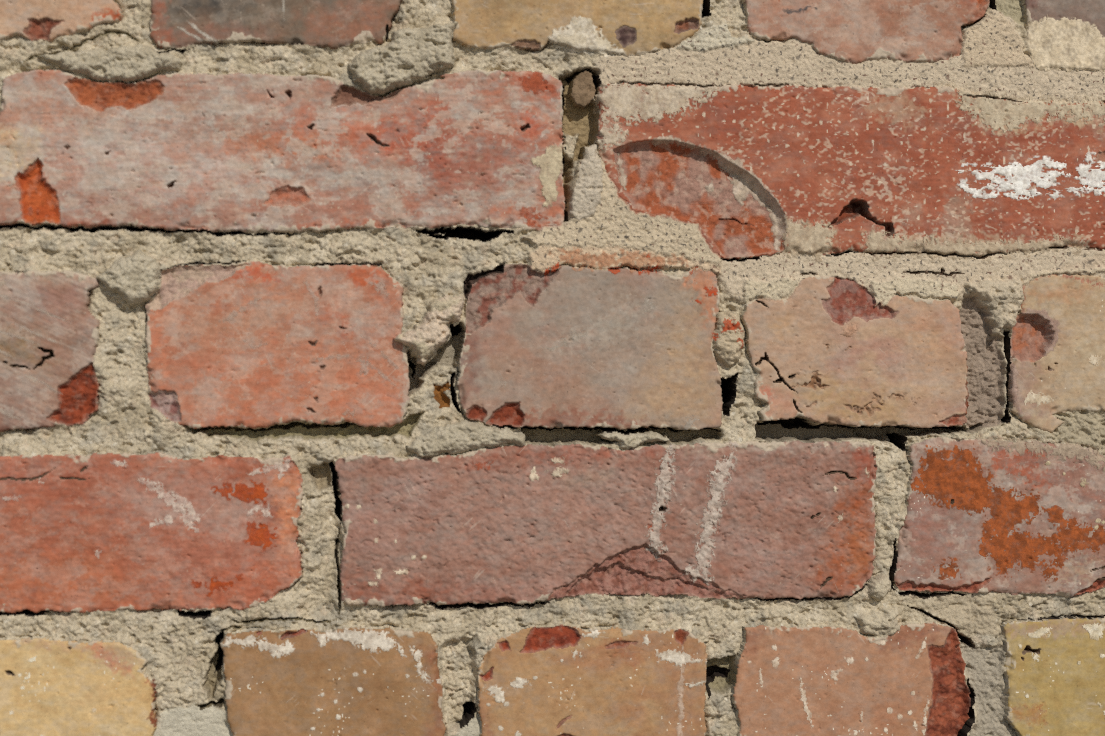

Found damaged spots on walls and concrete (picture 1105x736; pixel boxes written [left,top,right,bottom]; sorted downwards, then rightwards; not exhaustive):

spalling [613,141,787,258]
spalling [46,363,99,426]
crack [755,353,803,413]
spalling [925,628,971,736]